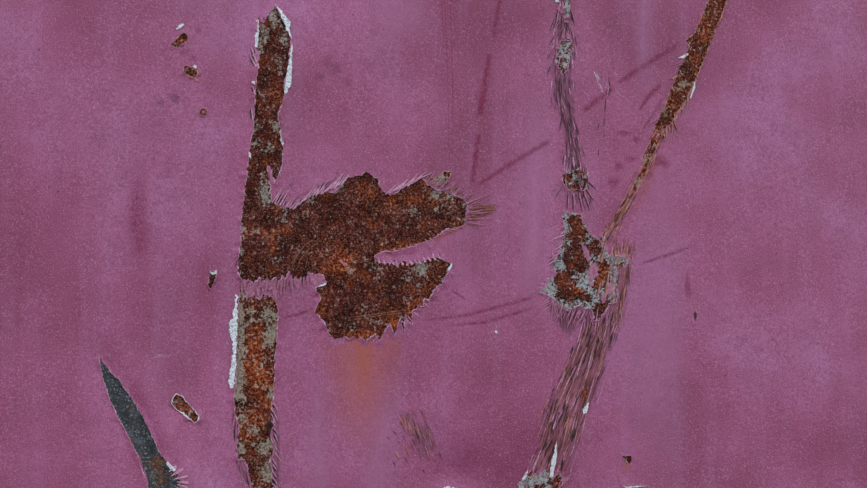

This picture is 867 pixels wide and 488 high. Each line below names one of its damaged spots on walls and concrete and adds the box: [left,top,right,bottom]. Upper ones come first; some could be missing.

corrosion [227,2,498,488]
corrosion [535,209,638,336]
spalling [94,352,189,488]
peeling [169,391,205,428]